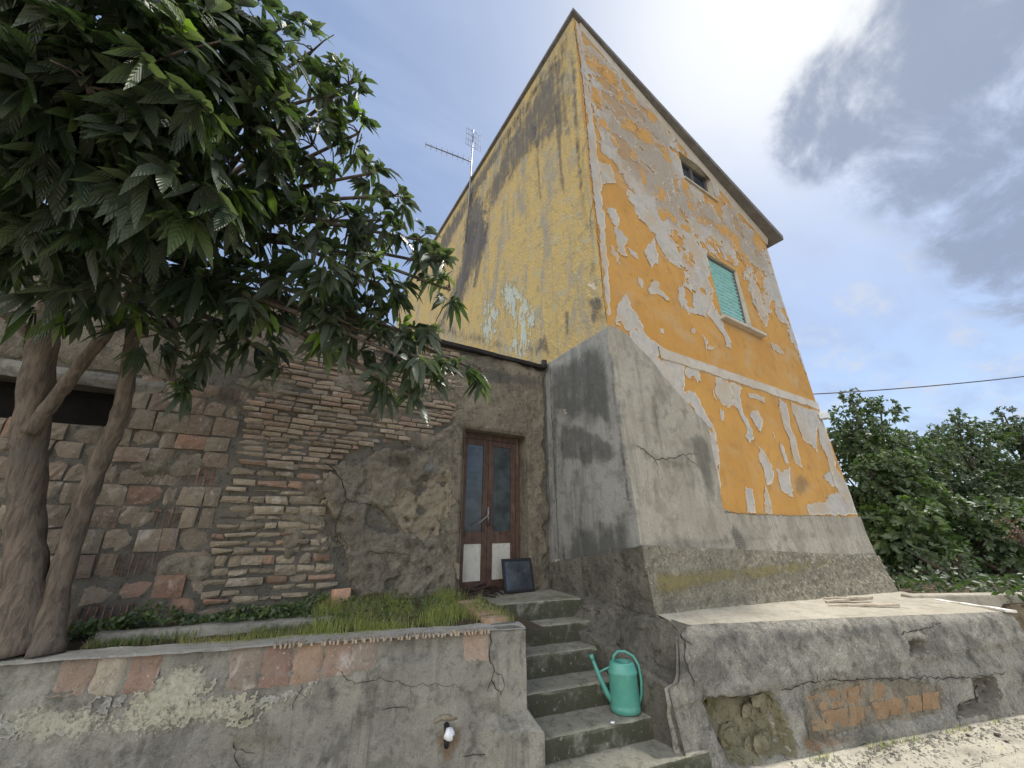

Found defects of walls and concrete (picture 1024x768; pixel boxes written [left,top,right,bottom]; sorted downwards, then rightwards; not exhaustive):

leakage [438,44,566,335]
peeling [575,21,858,517]
peeling [481,278,536,359]
leakage [590,298,601,322]
leakage [544,353,609,472]
crack [638,446,698,474]
crack [325,461,408,576]
leakage [10,667,273,741]
crack [487,634,505,696]
spalling [703,691,797,767]
crack [781,671,1005,698]
spalling [956,675,1004,721]